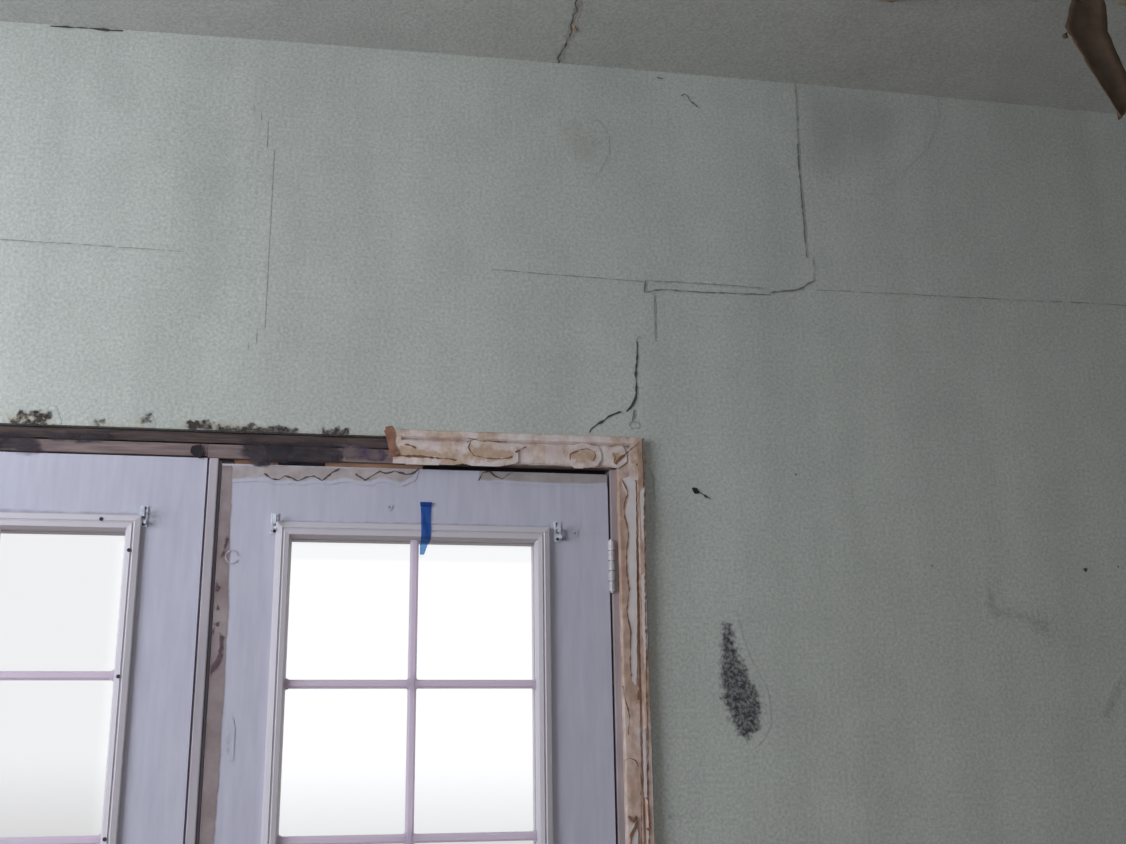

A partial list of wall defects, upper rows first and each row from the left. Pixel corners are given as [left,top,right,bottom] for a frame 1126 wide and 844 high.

crack [555,0,583,63]
crack [491,83,1126,433]
damp [0,432,111,452]
damp [242,438,386,466]